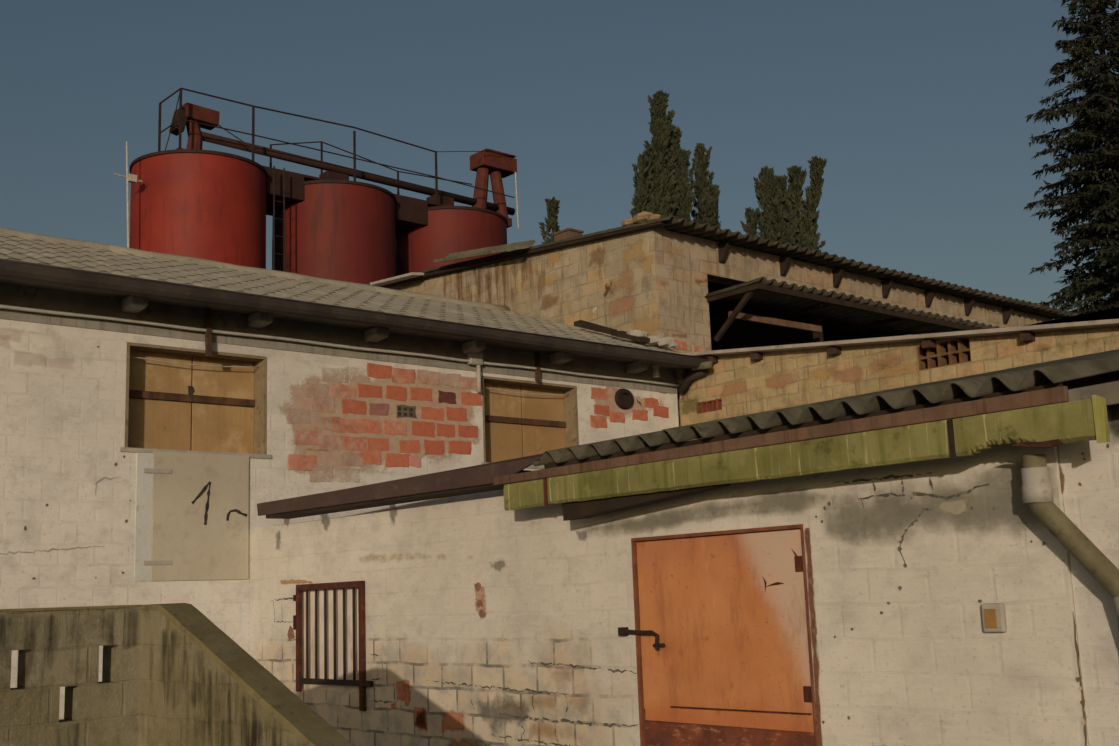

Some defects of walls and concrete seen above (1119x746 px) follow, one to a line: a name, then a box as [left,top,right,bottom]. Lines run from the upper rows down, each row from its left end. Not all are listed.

flaking render [284,363,483,483]
flaking render [590,386,669,428]
damp [840,467,1030,530]
crack [0,546,103,555]
crack [832,472,989,614]
spalling [474,582,486,618]
corrosion [670,528,822,746]
damp [482,702,526,728]